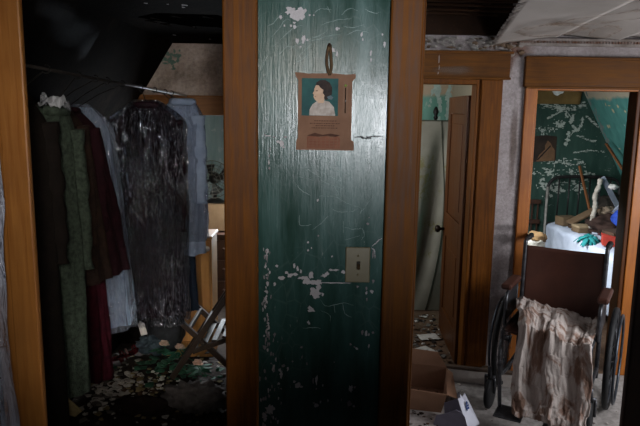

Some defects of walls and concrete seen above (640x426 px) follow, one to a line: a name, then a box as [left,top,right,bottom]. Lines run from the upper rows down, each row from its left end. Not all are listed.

peeling [279,7,314,29]
spalling [425,0,526,57]
peeling [532,92,621,197]
peeling [259,248,345,426]